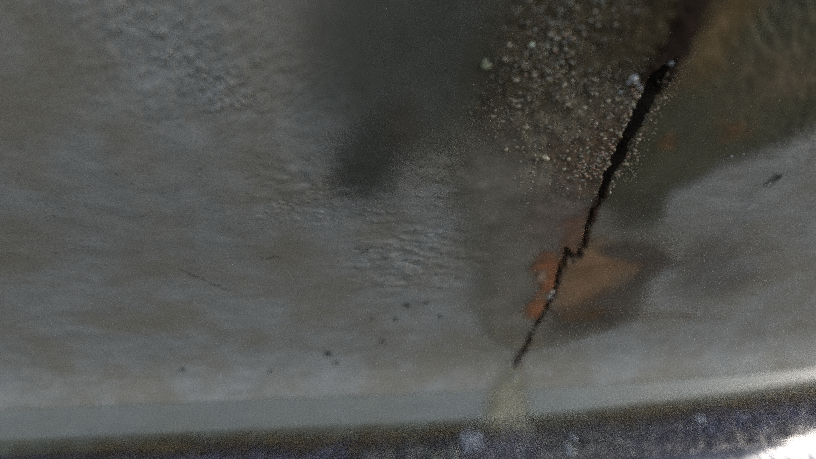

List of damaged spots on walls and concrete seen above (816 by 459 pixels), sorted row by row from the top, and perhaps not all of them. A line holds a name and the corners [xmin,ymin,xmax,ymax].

spalling [442,0,658,210]
corrosion [528,218,643,317]
crack [511,0,709,369]